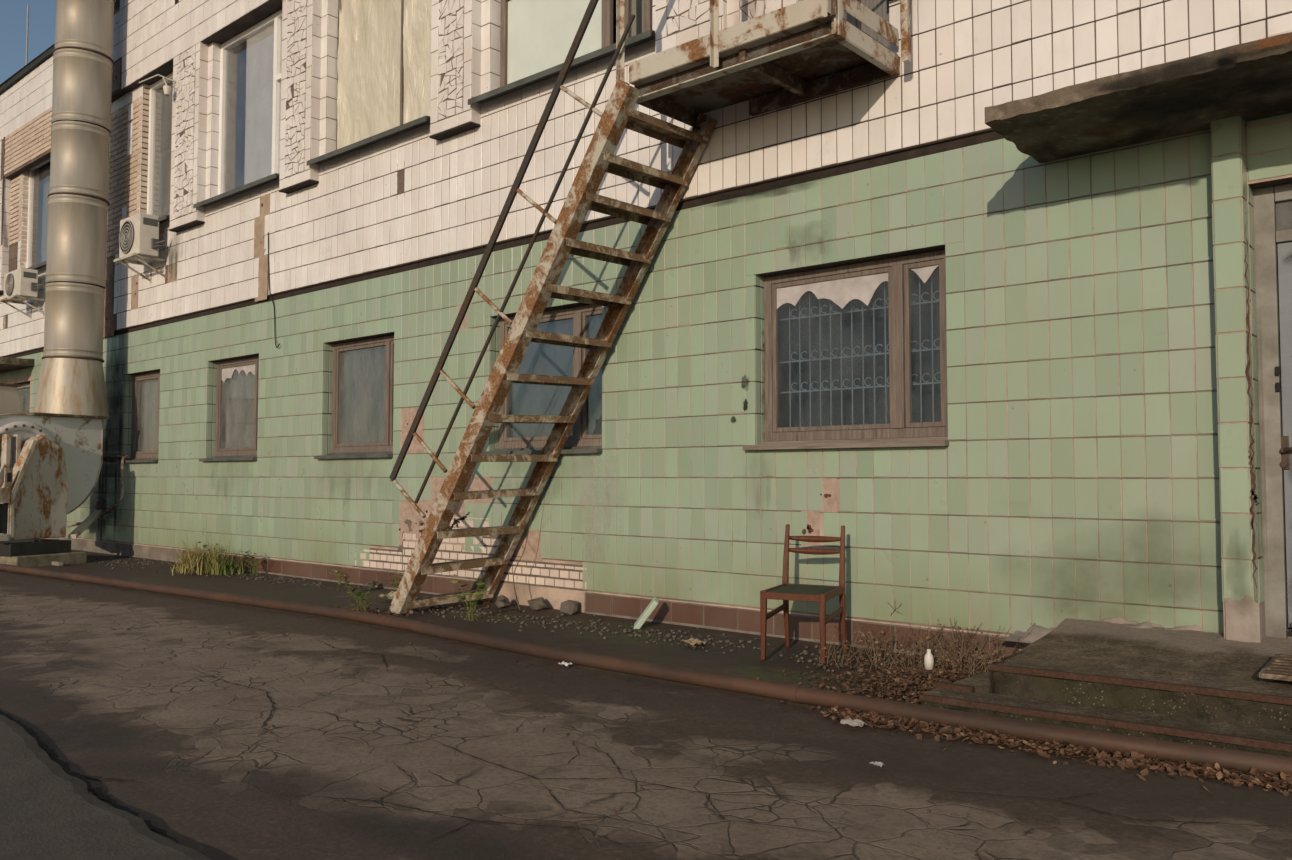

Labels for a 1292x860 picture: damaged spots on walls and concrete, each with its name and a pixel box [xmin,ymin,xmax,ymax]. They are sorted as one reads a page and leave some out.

spalling [253,193,271,302]
spalling [402,407,424,454]
spalling [353,473,445,572]
spalling [427,473,503,580]
spalling [500,529,588,591]
spalling [801,478,837,548]
crack [198,671,356,738]
crack [0,711,178,843]
crack [272,732,873,849]